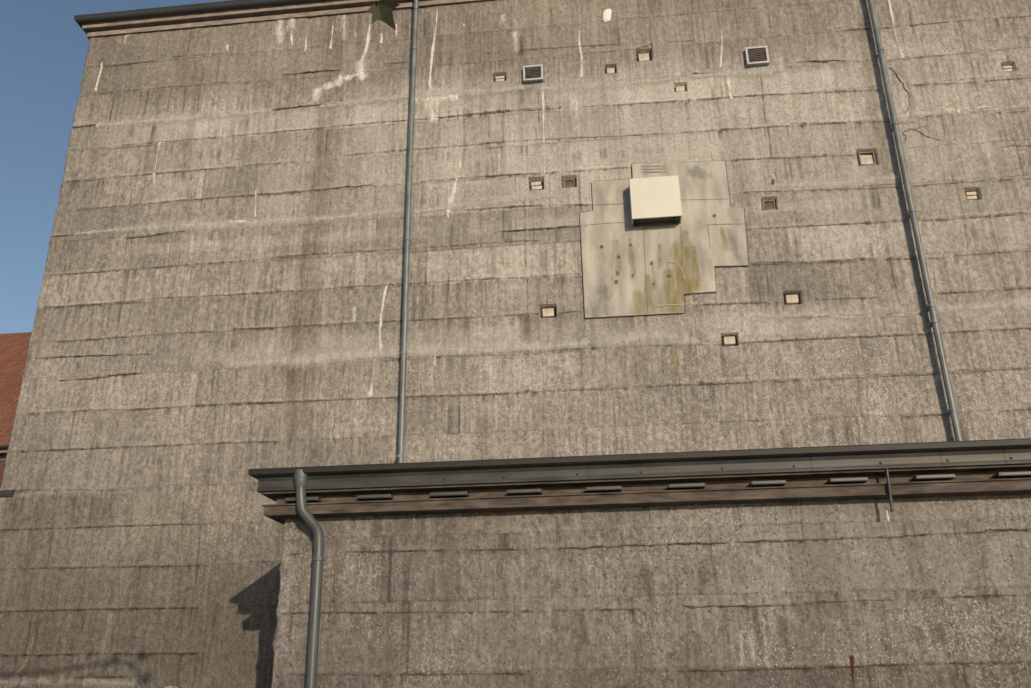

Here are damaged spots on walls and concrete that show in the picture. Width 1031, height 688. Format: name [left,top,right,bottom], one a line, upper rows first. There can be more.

water stain [275,18,307,52]
water stain [313,15,383,102]
crack [887,68,939,143]